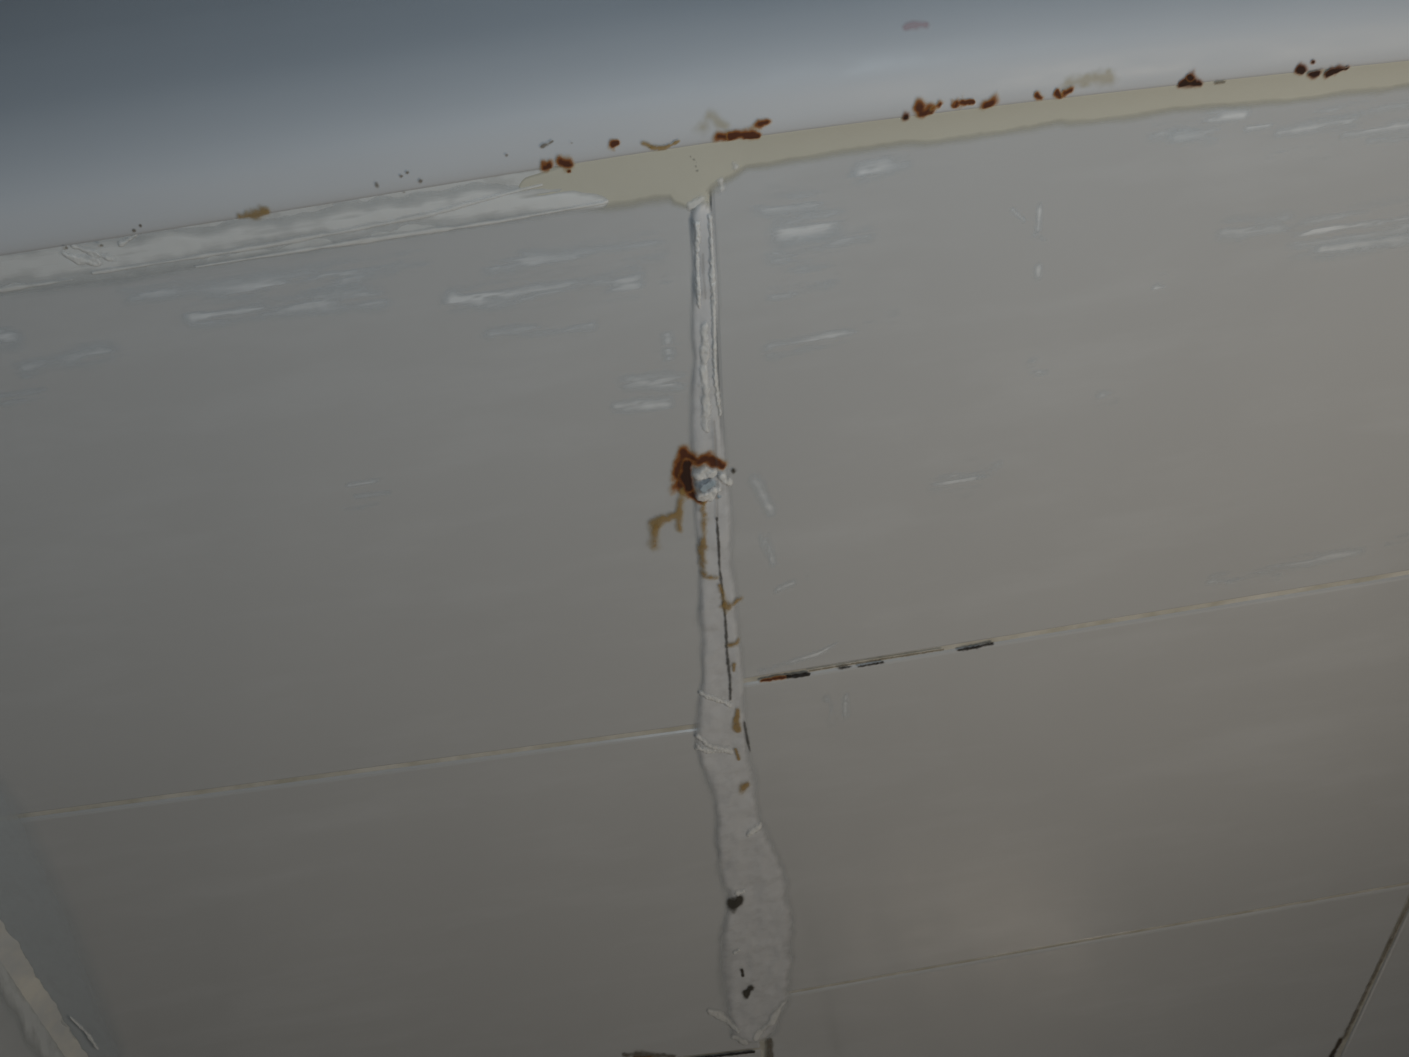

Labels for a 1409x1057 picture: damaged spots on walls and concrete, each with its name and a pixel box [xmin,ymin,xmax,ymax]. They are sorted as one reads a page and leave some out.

rust [1295,60,1349,79]
rust [1178,73,1225,88]
rust [1034,87,1074,100]
rust [903,96,998,121]
rust [714,119,771,142]
rust [642,140,680,150]
rust [541,156,574,173]
rust [651,446,742,610]
crack [716,518,751,751]
crack [700,1049,755,1057]